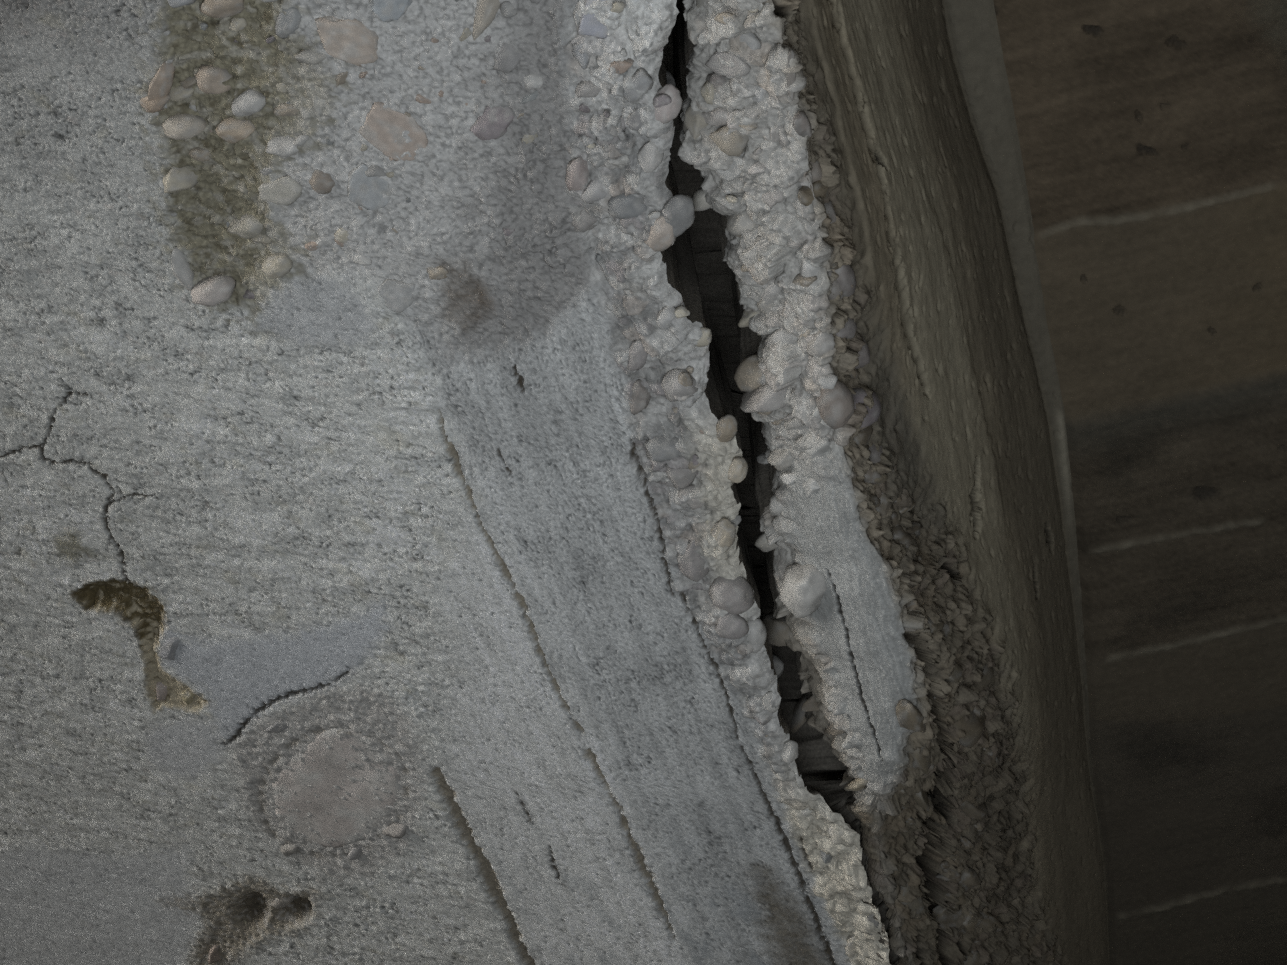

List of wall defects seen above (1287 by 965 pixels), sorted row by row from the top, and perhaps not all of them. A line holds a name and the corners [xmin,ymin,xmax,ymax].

crack [0,391,153,583]
spalling [68,577,211,715]
crack [223,667,351,748]
crack [436,409,676,941]
spalling [139,0,1069,965]
crack [629,0,972,965]